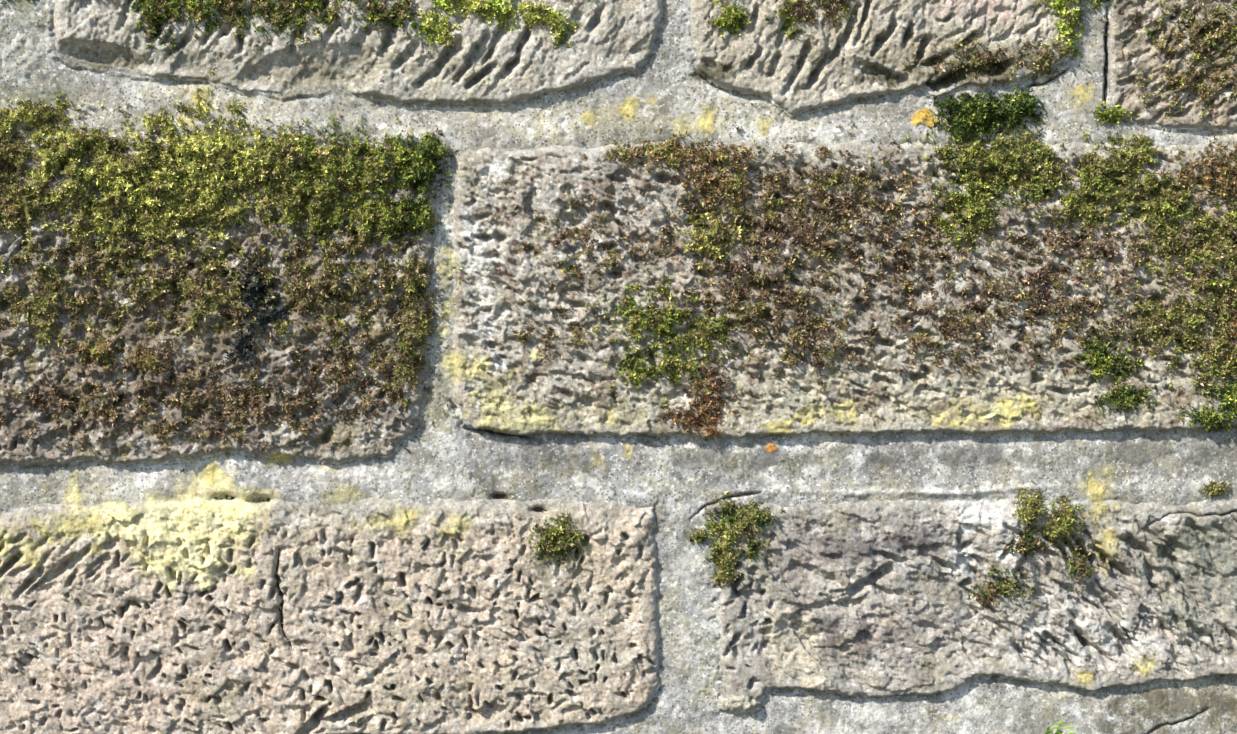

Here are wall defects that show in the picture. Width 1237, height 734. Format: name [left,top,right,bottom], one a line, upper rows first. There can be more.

crack [1141,510,1237,530]
crack [1147,709,1207,734]